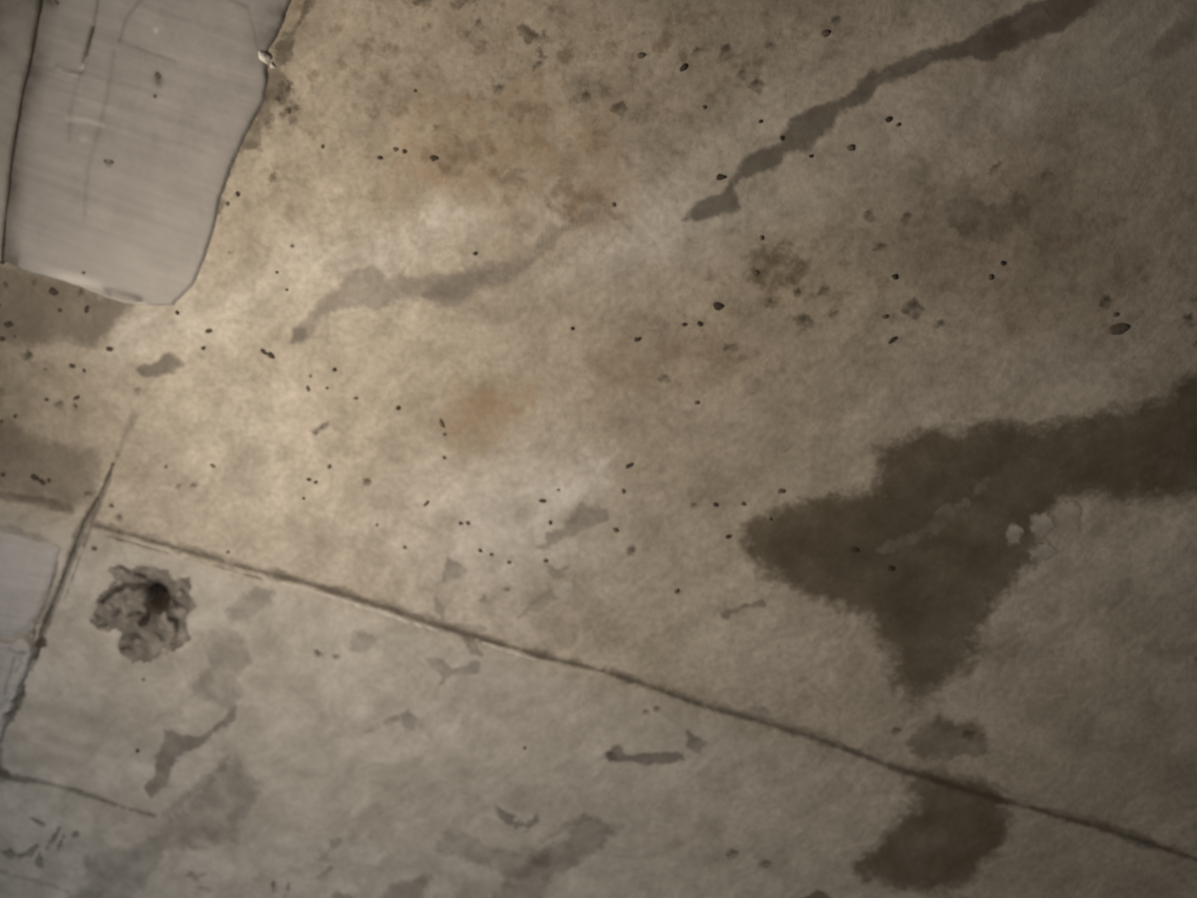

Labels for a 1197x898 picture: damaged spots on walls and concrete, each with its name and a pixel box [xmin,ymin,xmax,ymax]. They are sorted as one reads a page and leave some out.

flaking render [258,50,276,69]
damp [933,0,1080,59]
crack [8,685,25,717]
flaking render [0,633,37,749]
crack [32,463,114,658]
spalling [90,566,191,663]
crack [281,582,440,633]
crack [481,641,542,662]
damp [748,377,1197,682]
damp [861,782,1004,889]